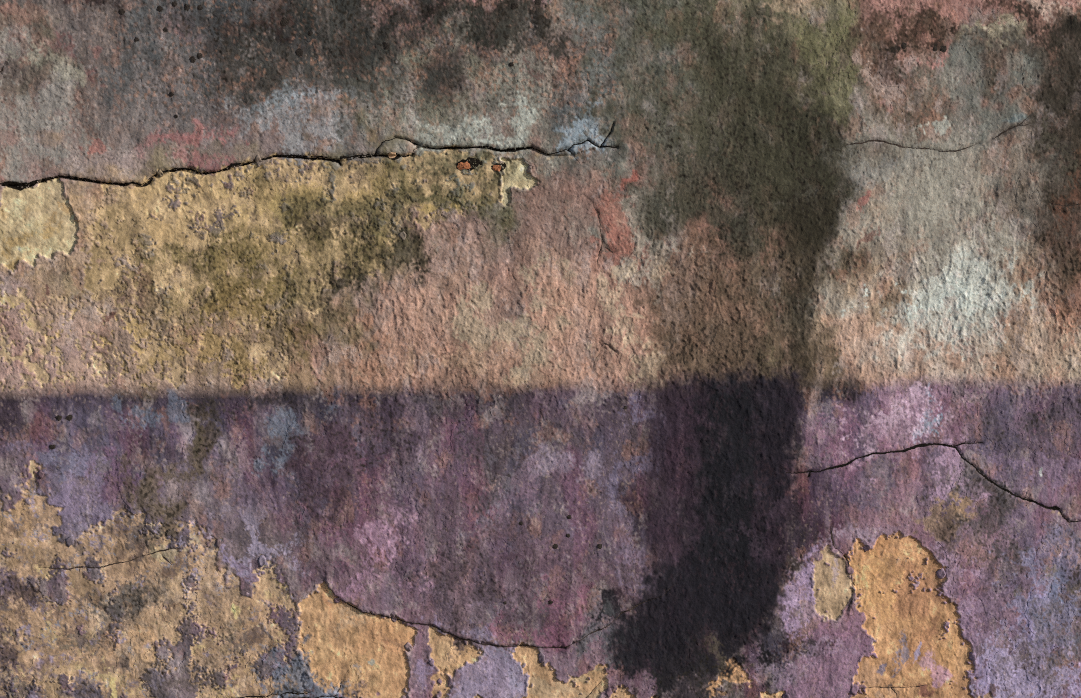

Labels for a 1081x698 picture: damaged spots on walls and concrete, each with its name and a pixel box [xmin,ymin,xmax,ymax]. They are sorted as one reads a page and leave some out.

peeling [0,150,327,394]
crack [0,124,617,187]
damp [95,0,585,393]
spalling [386,143,539,192]
damp [546,0,1081,698]
damp [0,555,371,698]
peeling [0,458,485,698]
damp [104,363,540,663]
crack [321,578,674,648]
peeling [509,641,653,698]
peeling [811,481,996,698]
crack [786,442,1081,522]